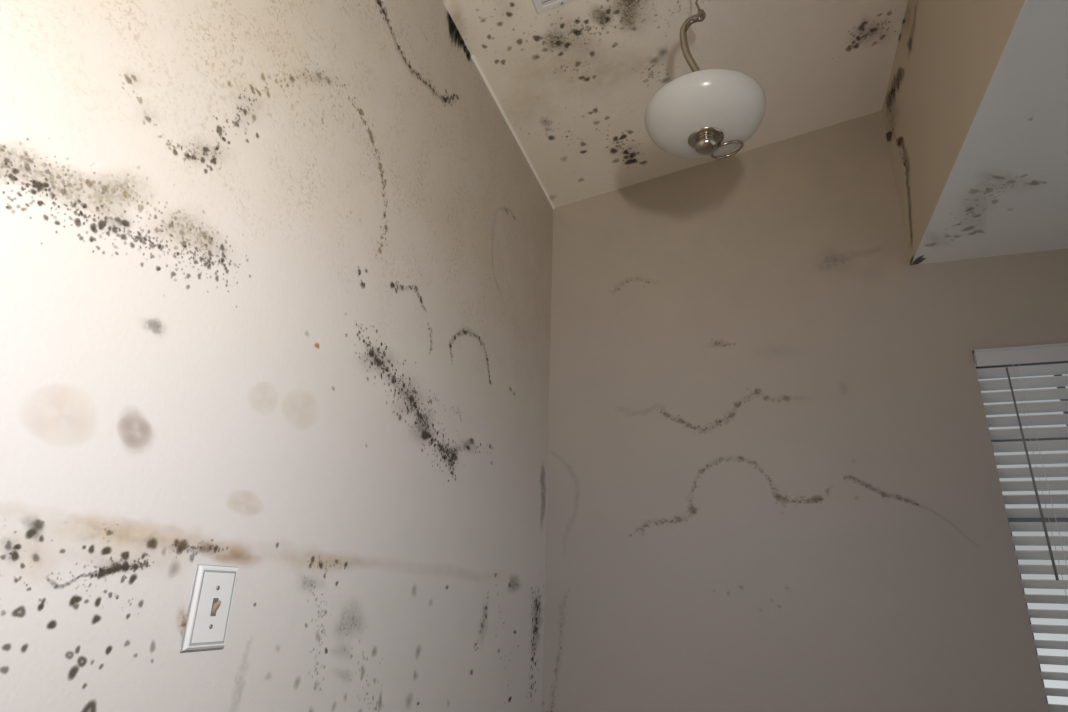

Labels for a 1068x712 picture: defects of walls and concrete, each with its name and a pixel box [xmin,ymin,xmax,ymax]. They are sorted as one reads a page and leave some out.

crack [448,12,470,60]
water stain [552,0,633,55]
water stain [167,126,230,173]
water stain [611,135,637,164]
mould [3,159,231,286]
mould [356,323,457,480]
water stain [12,521,44,582]
water stain [78,546,150,583]
water stain [67,647,87,688]